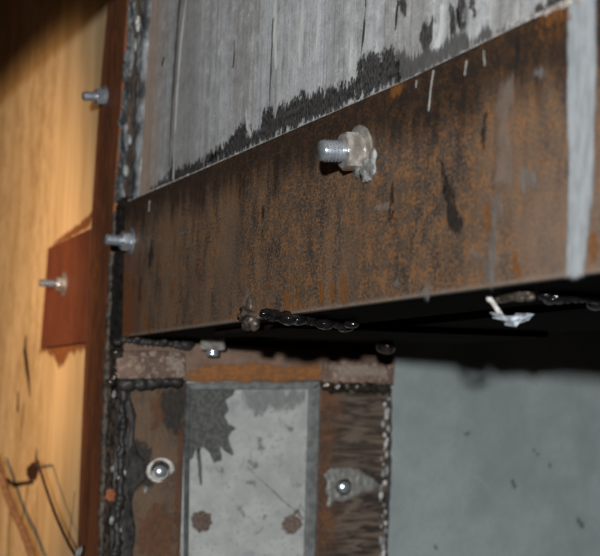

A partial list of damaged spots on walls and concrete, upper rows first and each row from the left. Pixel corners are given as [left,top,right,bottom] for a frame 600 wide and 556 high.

spalling [419,16,436,51]
spalling [449,0,476,35]
damp [441,161,463,235]
rust [188,362,321,383]
peeling [190,390,235,485]
rust [191,511,212,533]
rust [281,509,303,534]